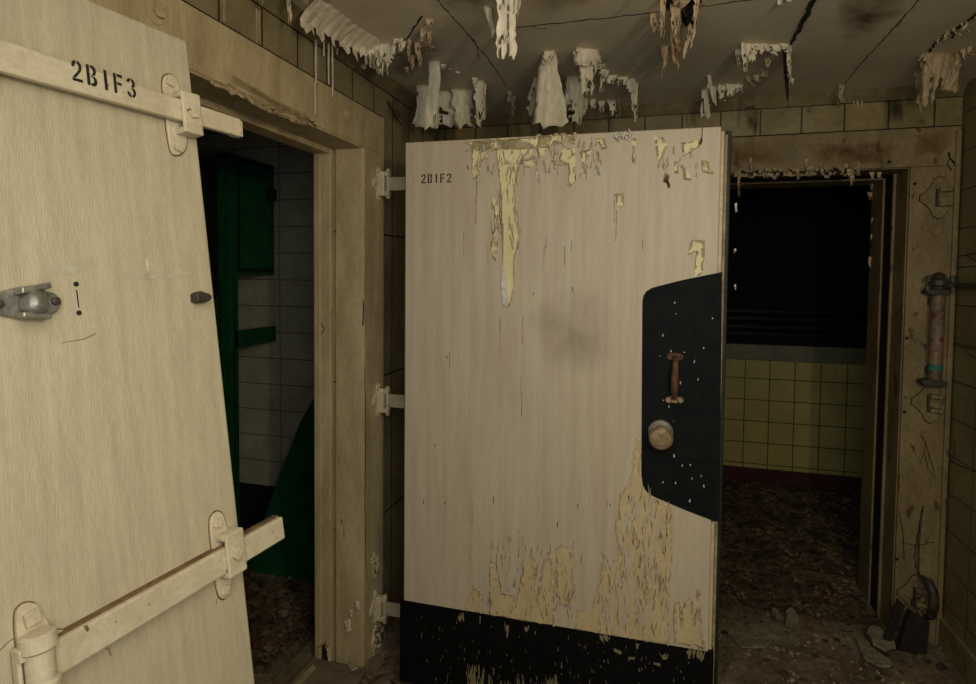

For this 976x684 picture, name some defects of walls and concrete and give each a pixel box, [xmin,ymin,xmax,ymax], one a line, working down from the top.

peeling [286,0,486,131]
peeling [484,0,521,60]
peeling [650,0,709,78]
peeling [700,42,794,119]
peeling [914,16,976,115]
peeling [464,47,639,307]
peeling [653,137,714,181]
peeling [733,157,882,212]
peeling [688,240,705,277]
peeling [456,437,705,684]